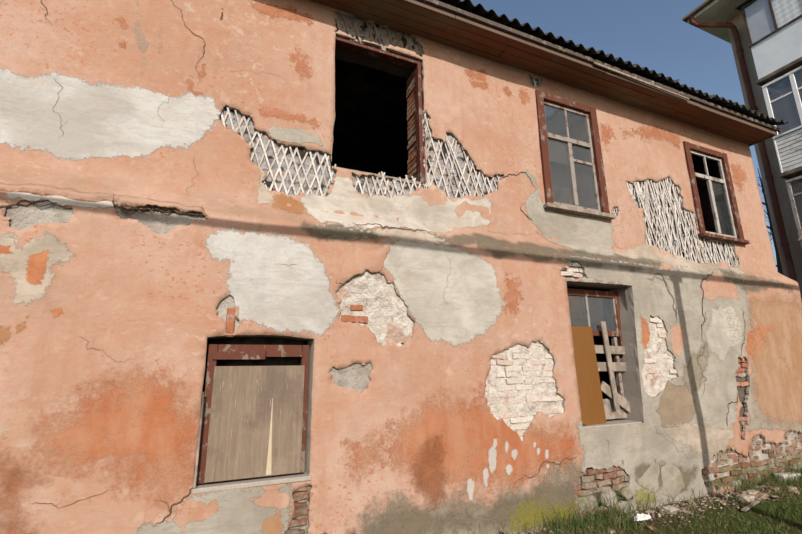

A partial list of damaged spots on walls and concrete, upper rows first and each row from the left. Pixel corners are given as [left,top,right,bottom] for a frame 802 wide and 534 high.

peeling [186,64,206,97]
peeling [219,106,560,246]
peeling [0,192,206,344]
peeling [216,295,240,337]
peeling [329,363,372,393]
peeling [335,271,414,346]
peeling [484,341,566,441]
crack [649,273,678,323]
crack [698,271,713,394]
peeling [611,177,802,490]